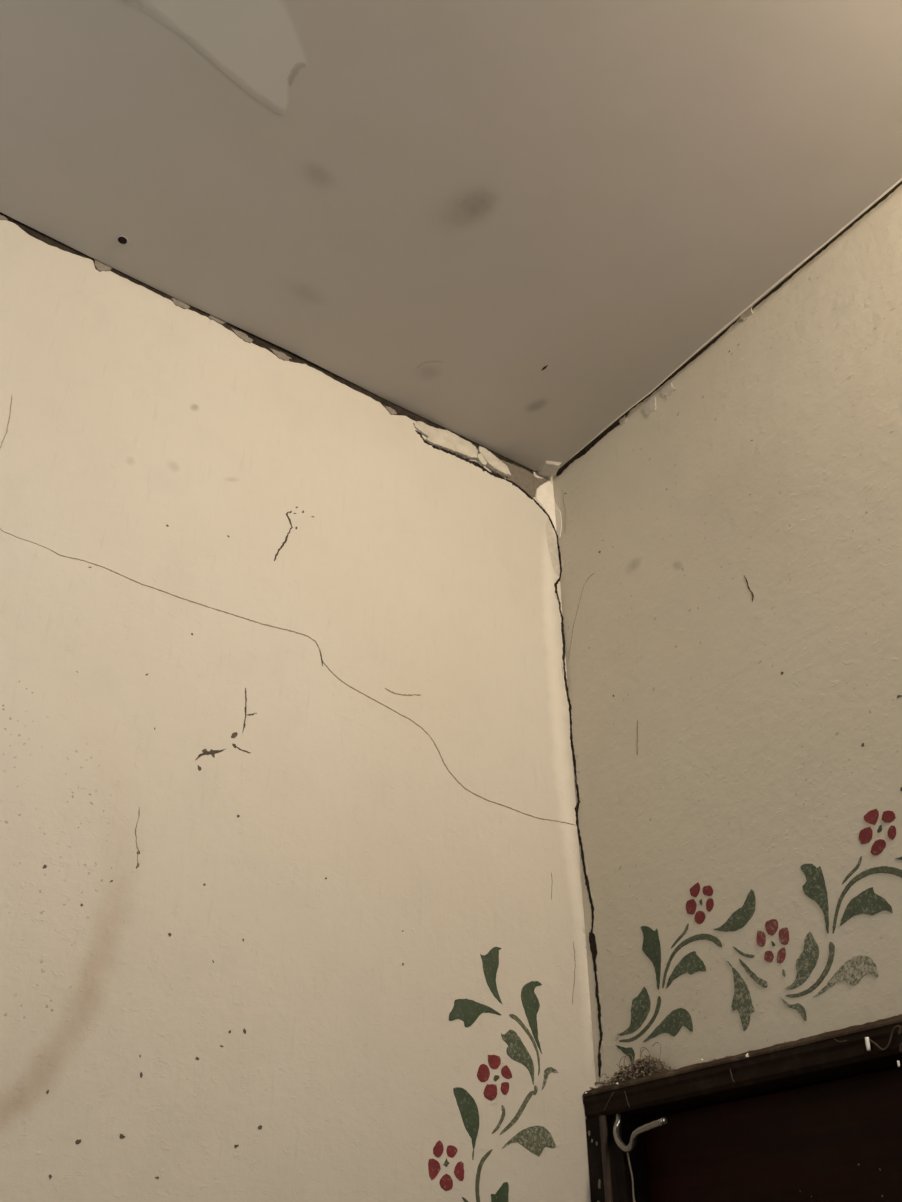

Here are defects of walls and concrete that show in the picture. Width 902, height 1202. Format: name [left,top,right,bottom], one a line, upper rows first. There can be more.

peeling [120,0,310,115]
water stain [0,661,149,1144]
crack [0,181,902,1077]
peeling [413,421,595,1081]